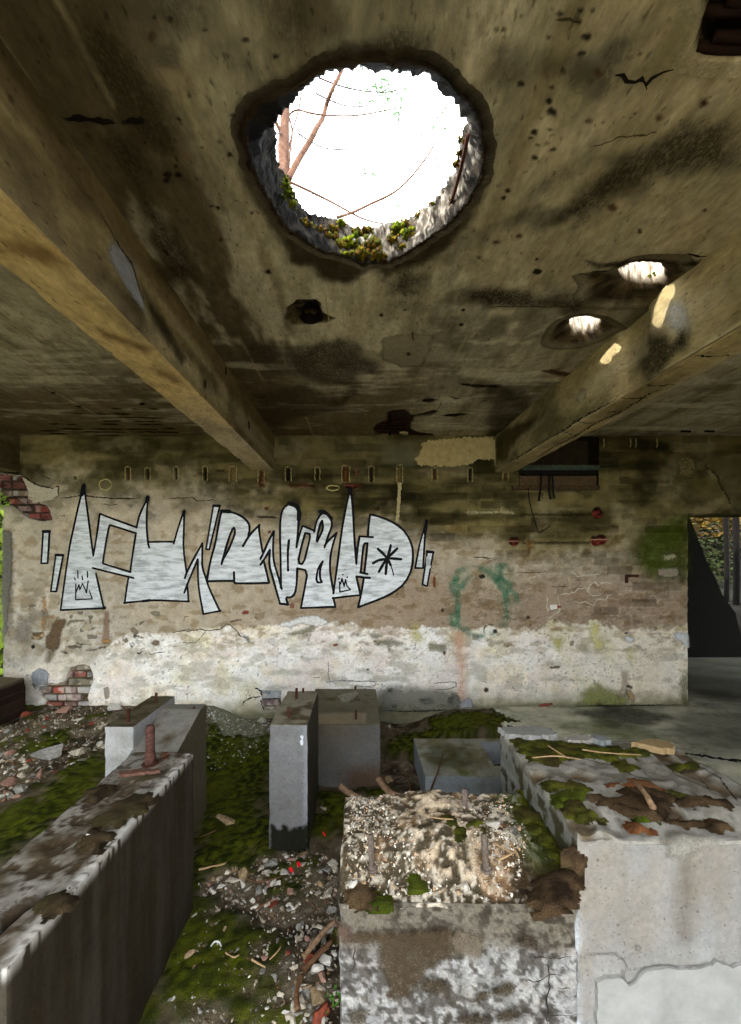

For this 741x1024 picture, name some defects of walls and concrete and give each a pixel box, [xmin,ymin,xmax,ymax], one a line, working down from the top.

crack [615,69,674,90]
spalling [228,44,497,271]
crack [590,131,657,147]
spalling [274,293,347,331]
spalling [540,254,702,350]
water stain [250,340,382,428]
spalling [0,471,58,526]
spalling [35,611,105,706]